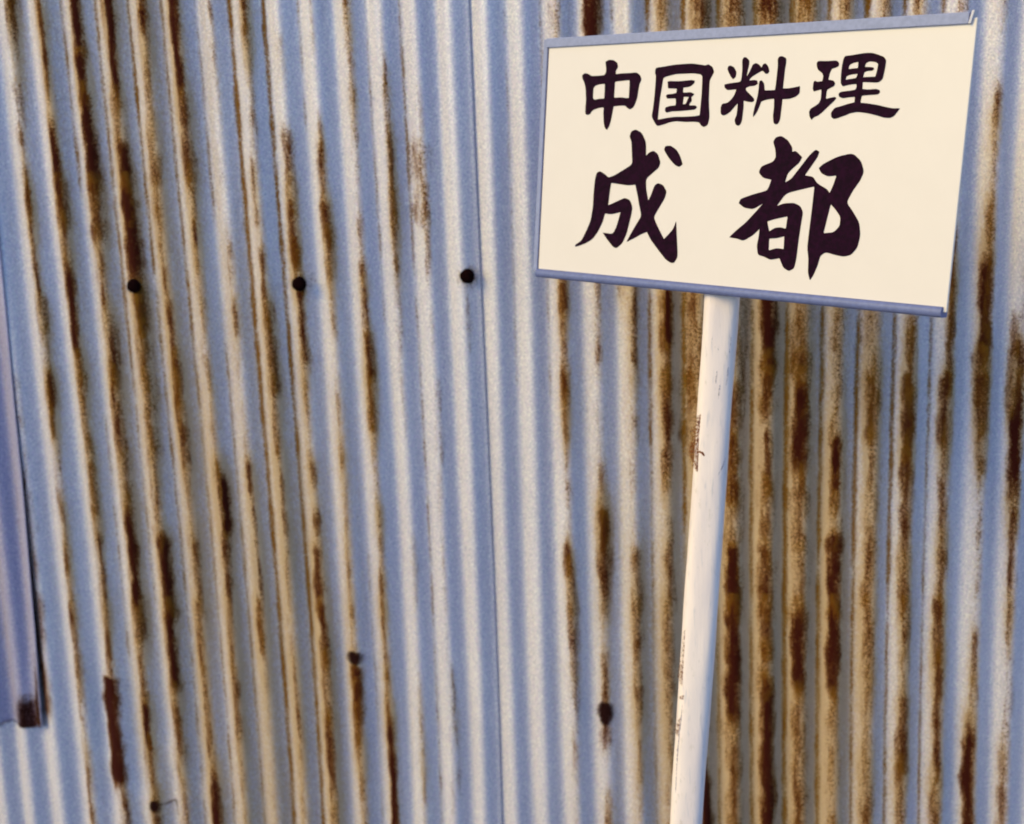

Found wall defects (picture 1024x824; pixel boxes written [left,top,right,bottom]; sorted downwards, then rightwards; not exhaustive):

rust [581,0,613,36]
rust [15,453,52,728]
rust [13,73,59,441]
rust [48,0,340,824]
rust [346,548,369,823]
rust [376,483,400,824]
rust [595,461,614,615]
rust [597,632,614,750]
rust [702,230,957,824]
rust [957,629,979,824]
rust [970,87,1001,493]
rust [995,301,1024,824]